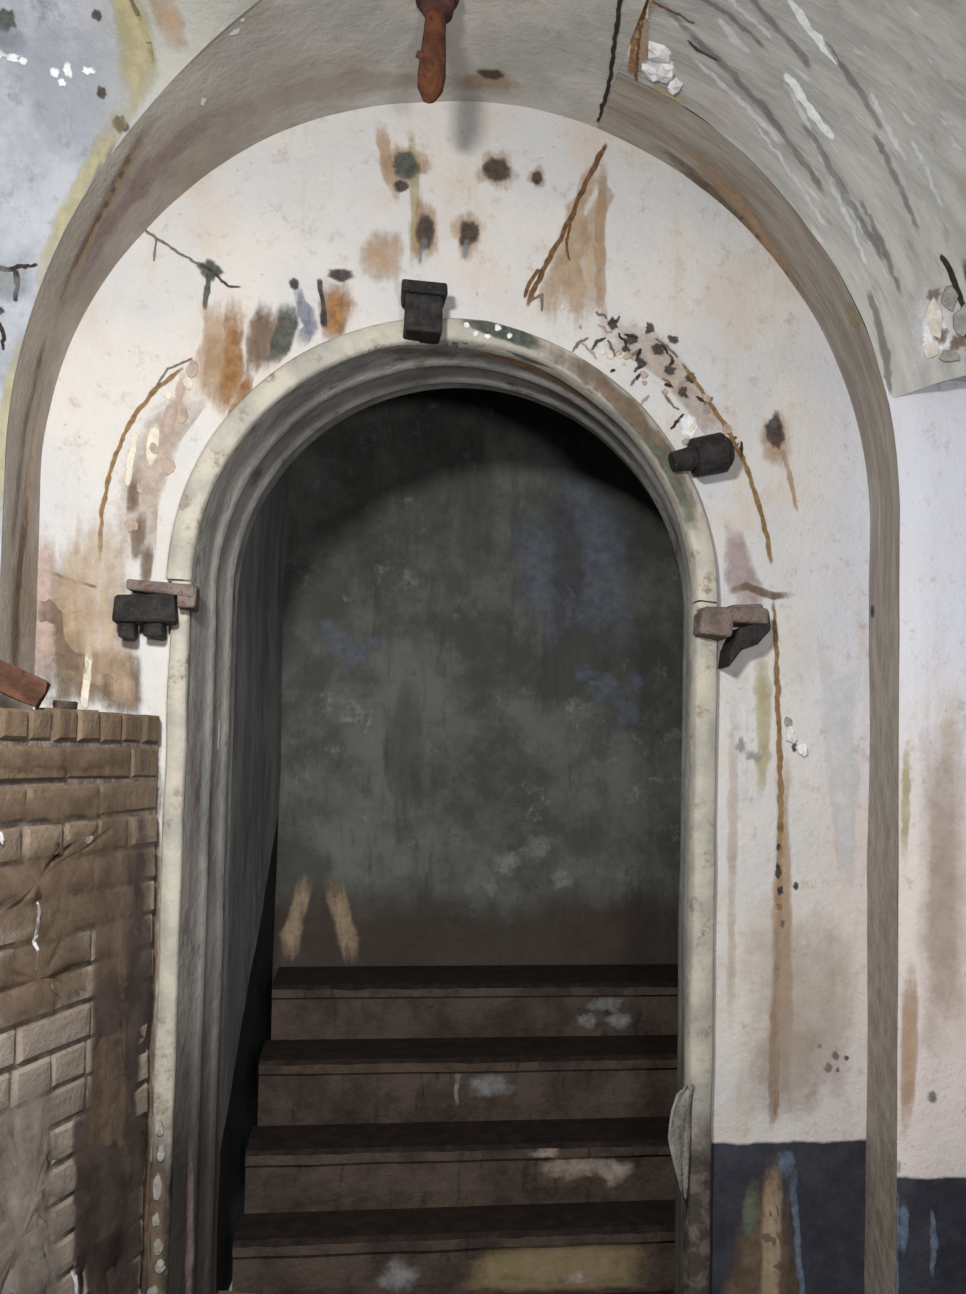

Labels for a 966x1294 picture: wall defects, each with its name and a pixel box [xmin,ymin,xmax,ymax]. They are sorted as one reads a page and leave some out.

crack [145,229,202,265]
corrosion [197,260,352,413]
corrosion [530,169,543,184]
corrosion [546,179,612,301]
crack [524,0,695,311]
spalling [572,311,743,457]
spalling [912,255,966,362]
corrosion [769,606,798,1113]
damp [0,826,160,1294]